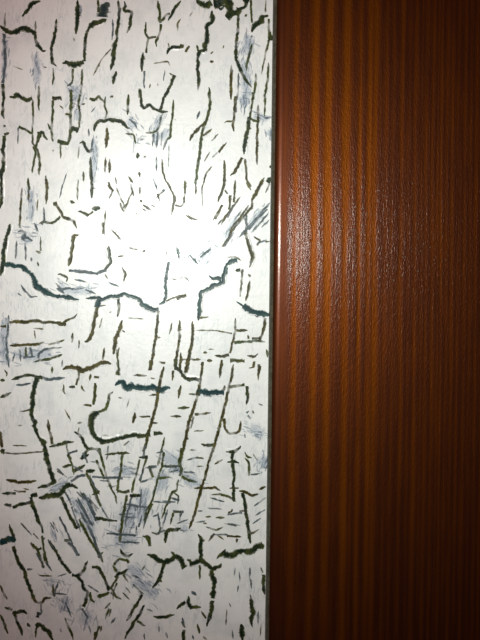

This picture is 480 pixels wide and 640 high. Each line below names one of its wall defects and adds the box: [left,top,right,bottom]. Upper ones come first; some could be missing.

crack [0,0,272,640]